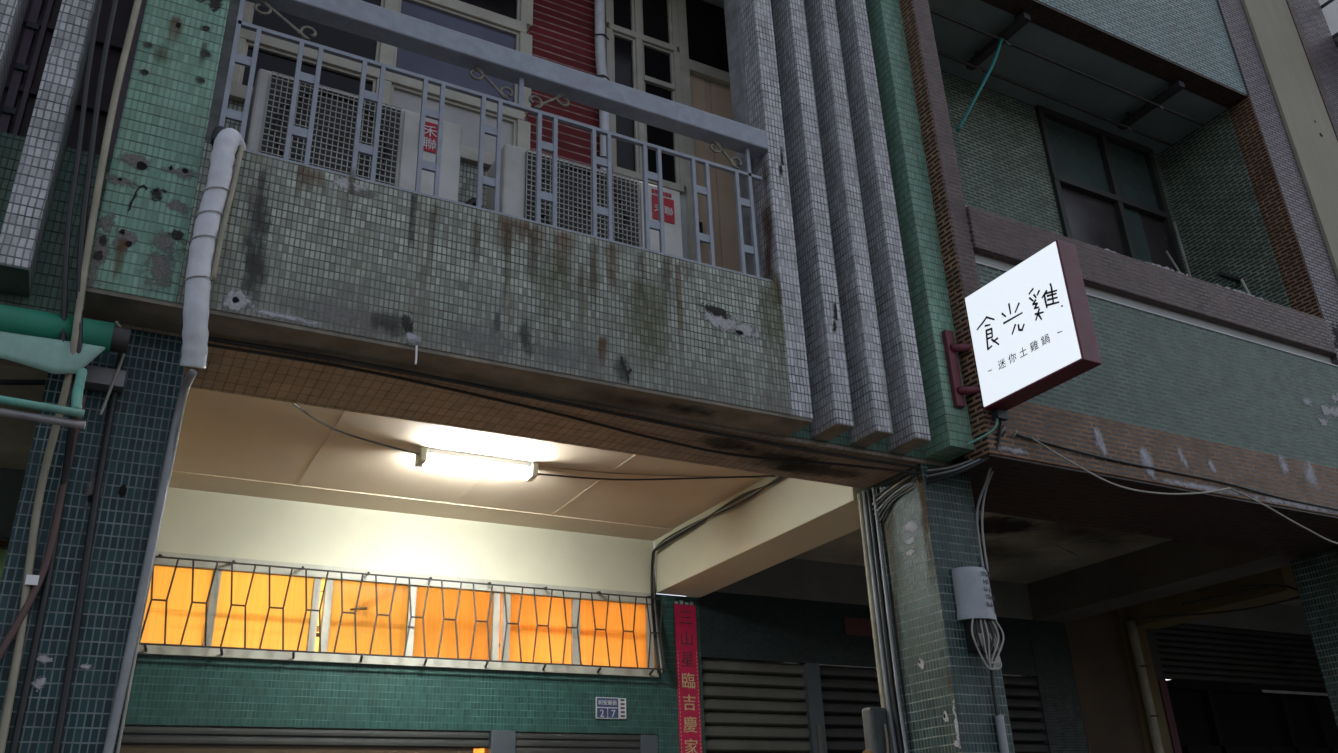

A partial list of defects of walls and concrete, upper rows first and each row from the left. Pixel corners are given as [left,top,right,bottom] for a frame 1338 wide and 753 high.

spalling [105,153,195,214]
spalling [88,215,116,287]
spalling [143,229,184,290]
spalling [696,302,761,342]
spalling [1303,392,1338,426]